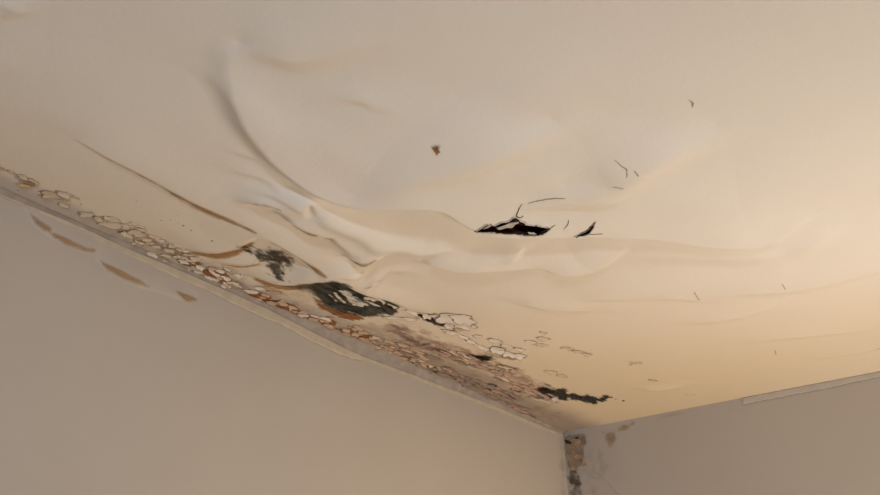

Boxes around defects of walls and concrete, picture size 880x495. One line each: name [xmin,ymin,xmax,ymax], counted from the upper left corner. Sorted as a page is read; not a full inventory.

damp [167,190,293,281]
peeling [0,168,558,418]
damp [297,262,401,321]
damp [536,385,625,404]
flaking render [564,434,587,490]